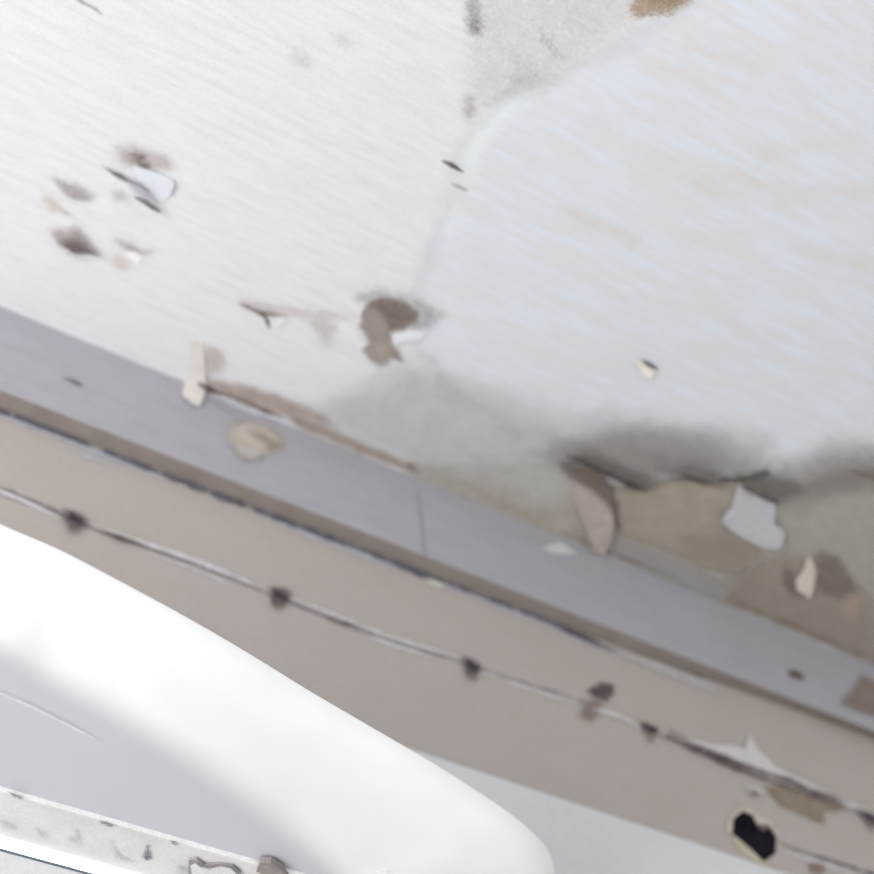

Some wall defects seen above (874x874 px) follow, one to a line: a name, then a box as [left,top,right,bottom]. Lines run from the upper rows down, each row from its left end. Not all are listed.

peeling [101,139,180,214]
flaking render [338,285,450,369]
peeling [182,339,231,407]
peeling [565,450,804,612]
leakage [605,467,874,666]
peeling [796,556,816,599]
peeling [676,734,843,824]
spalling [725,808,779,866]